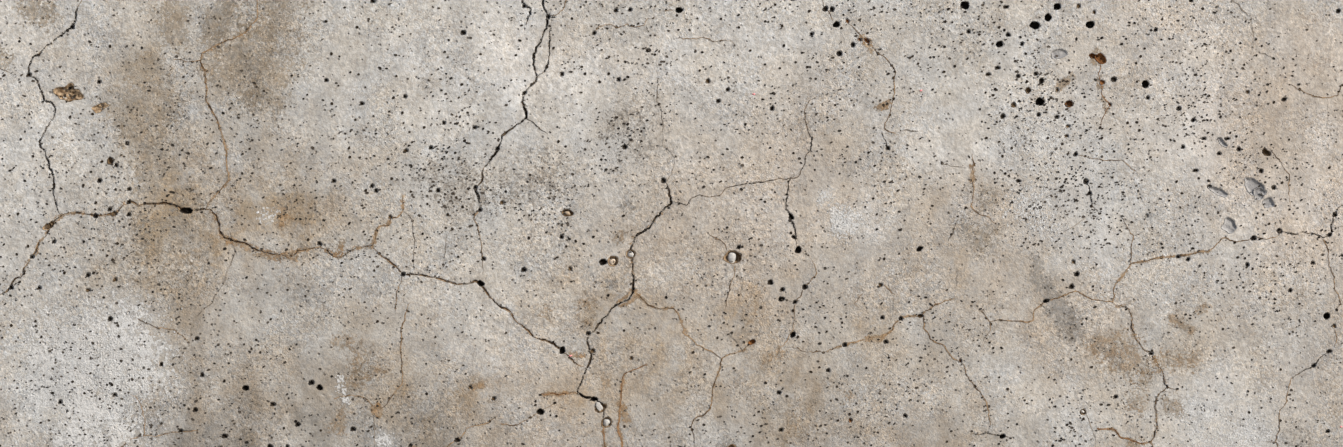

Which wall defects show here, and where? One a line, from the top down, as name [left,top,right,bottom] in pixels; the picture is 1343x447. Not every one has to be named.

crack [1232,0,1343,127]
crack [0,0,1012,447]
crack [982,148,1342,447]